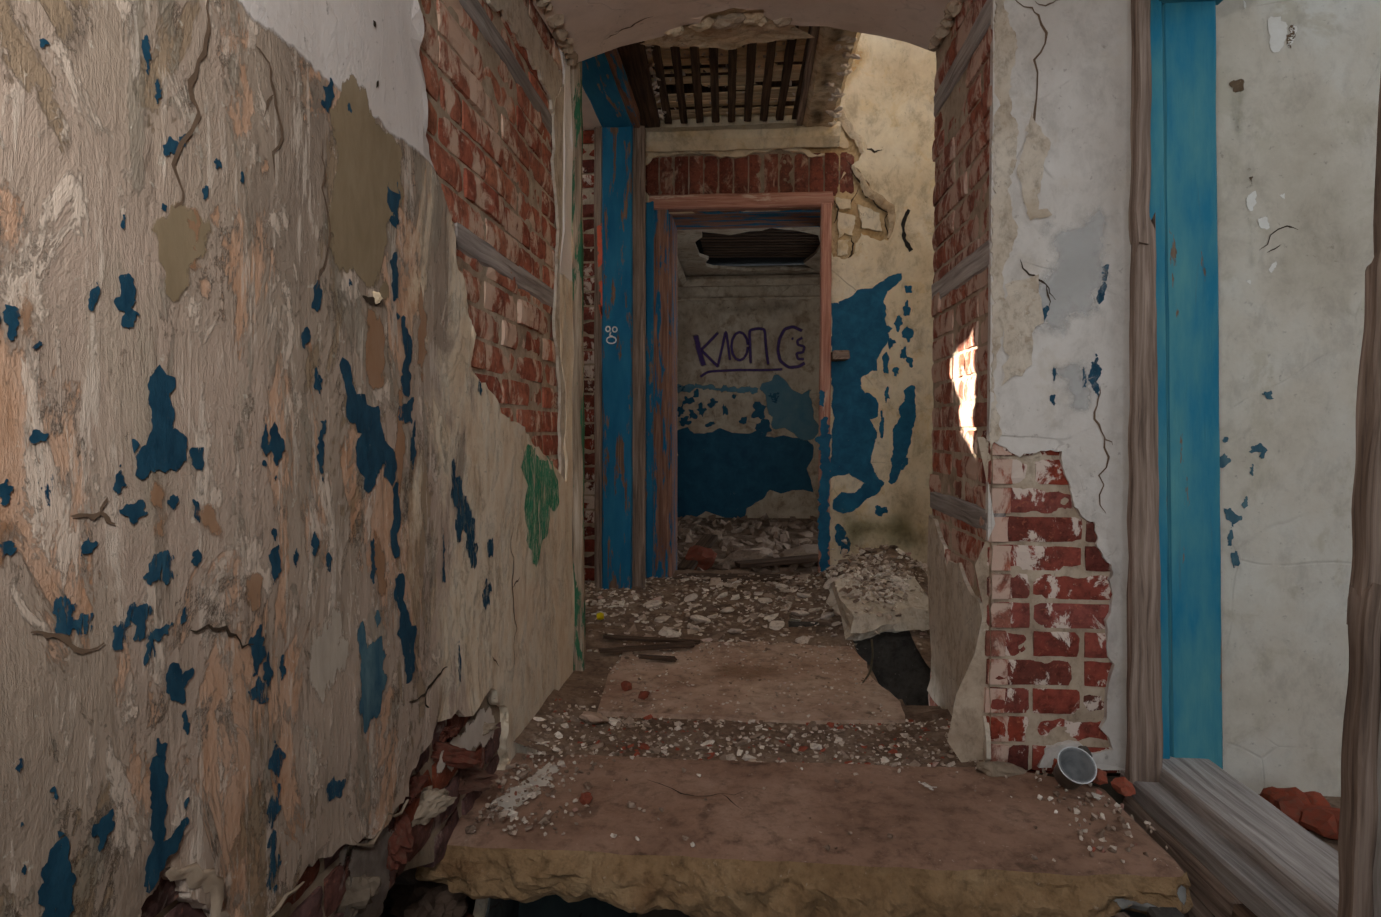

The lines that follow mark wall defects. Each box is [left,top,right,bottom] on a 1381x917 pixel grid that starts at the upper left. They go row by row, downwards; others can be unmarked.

crack [1015,0,1057,120]
peeling [88,273,140,328]
peeling [113,365,222,585]
peeling [309,74,427,734]
flaking render [418,0,578,565]
flaking render [677,0,1112,777]
crack [1020,260,1056,306]
crack [1093,389,1113,513]
peeling [111,602,194,735]
flaking render [141,738,231,917]
flaking render [266,695,501,917]
peeling [485,894,690,917]